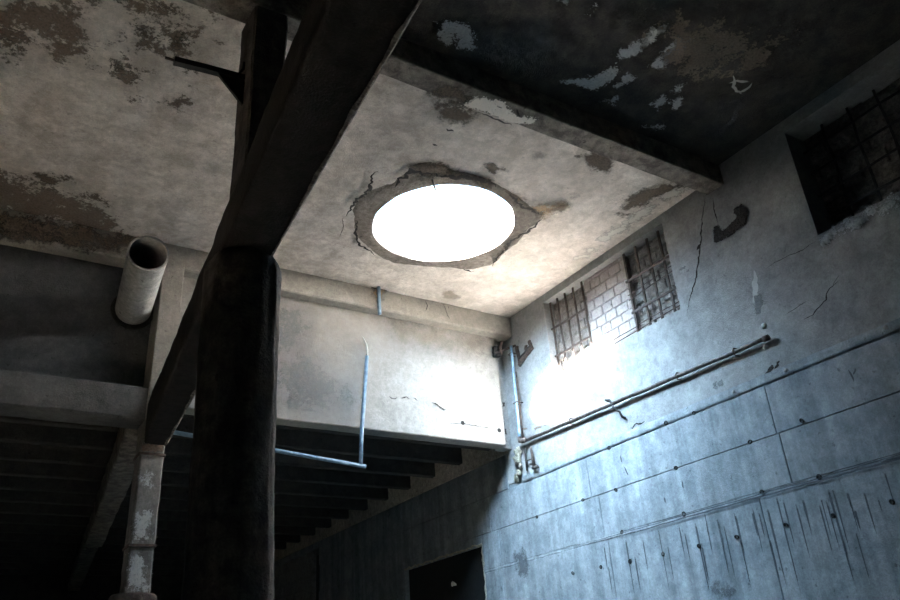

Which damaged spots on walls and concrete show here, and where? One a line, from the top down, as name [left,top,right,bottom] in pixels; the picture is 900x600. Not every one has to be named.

peeling [0,0,223,85]
spalling [560,0,807,111]
peeling [158,85,198,113]
flaking render [464,96,539,125]
peeling [0,168,124,233]
crack [340,168,545,272]
crack [687,194,717,310]
spalling [713,204,749,243]
crack [788,277,838,319]
peeling [125,508,158,592]